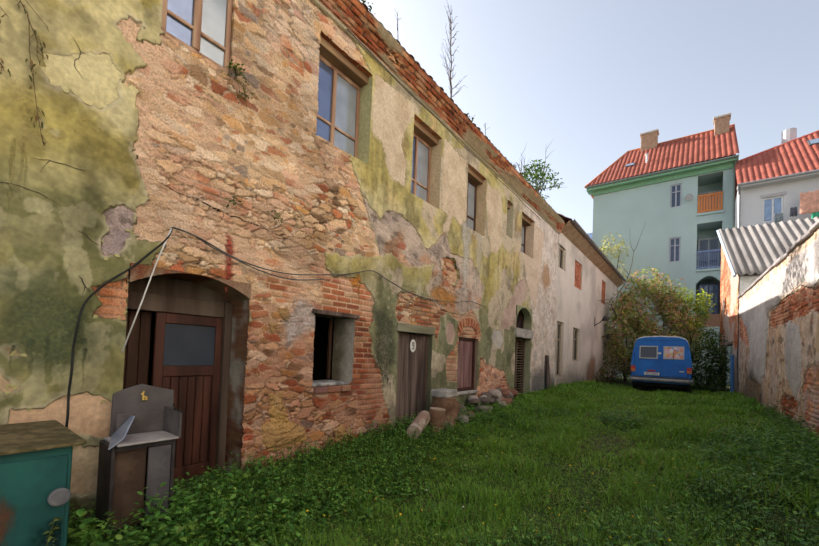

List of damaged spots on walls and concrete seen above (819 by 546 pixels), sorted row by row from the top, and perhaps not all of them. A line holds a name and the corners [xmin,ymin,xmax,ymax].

flaking render [40,0,484,474]
flaking render [476,358,510,405]
peeling [486,182,503,254]
peeling [491,222,544,348]
peeling [738,236,819,435]